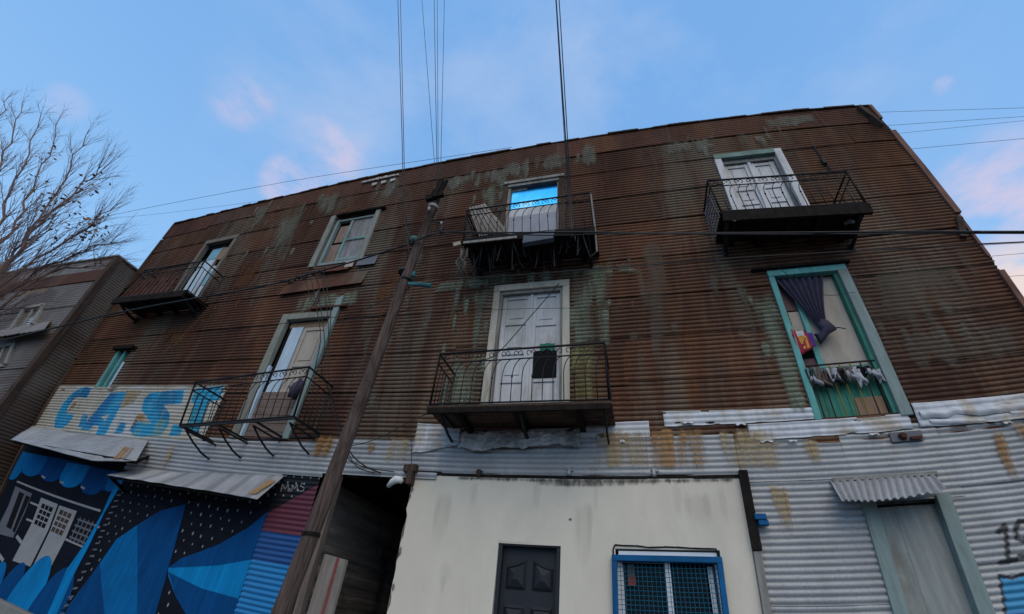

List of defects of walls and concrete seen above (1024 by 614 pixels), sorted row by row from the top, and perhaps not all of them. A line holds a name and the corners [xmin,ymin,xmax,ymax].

rust [597,430,703,468]
rust [994,431,1016,474]